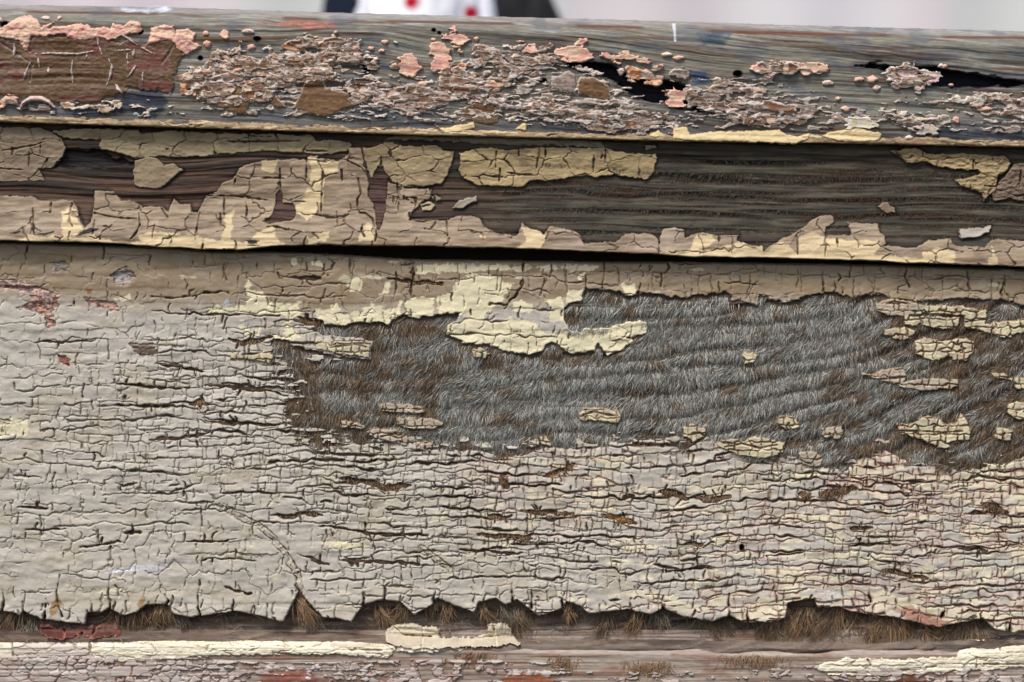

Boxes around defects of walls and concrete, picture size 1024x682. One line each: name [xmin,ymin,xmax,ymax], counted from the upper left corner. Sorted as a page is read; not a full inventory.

peeling [0,15,1024,188]
crack [151,292,322,349]
crack [116,363,287,447]
peeling [0,127,1024,633]
crack [340,476,411,495]
crack [459,458,575,556]
crack [604,485,733,529]
crack [275,512,428,567]
peeling [0,623,572,682]
peeling [608,671,716,682]
peeling [735,666,791,682]
peeling [802,639,1024,682]